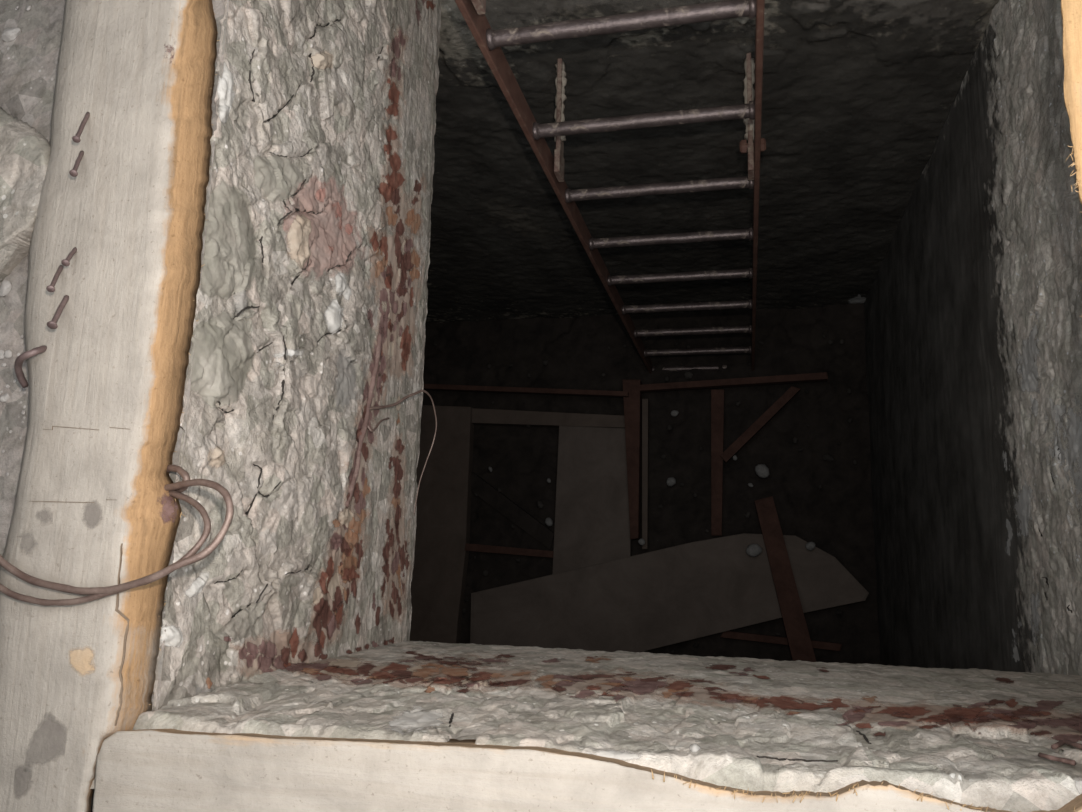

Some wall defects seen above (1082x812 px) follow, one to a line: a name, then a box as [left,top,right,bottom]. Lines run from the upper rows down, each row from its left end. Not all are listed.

corrosion [416,0,436,26]
crack [248,19,341,123]
crack [259,148,327,263]
crack [291,246,361,285]
crack [259,336,287,419]
corrosion [224,25,1082,742]